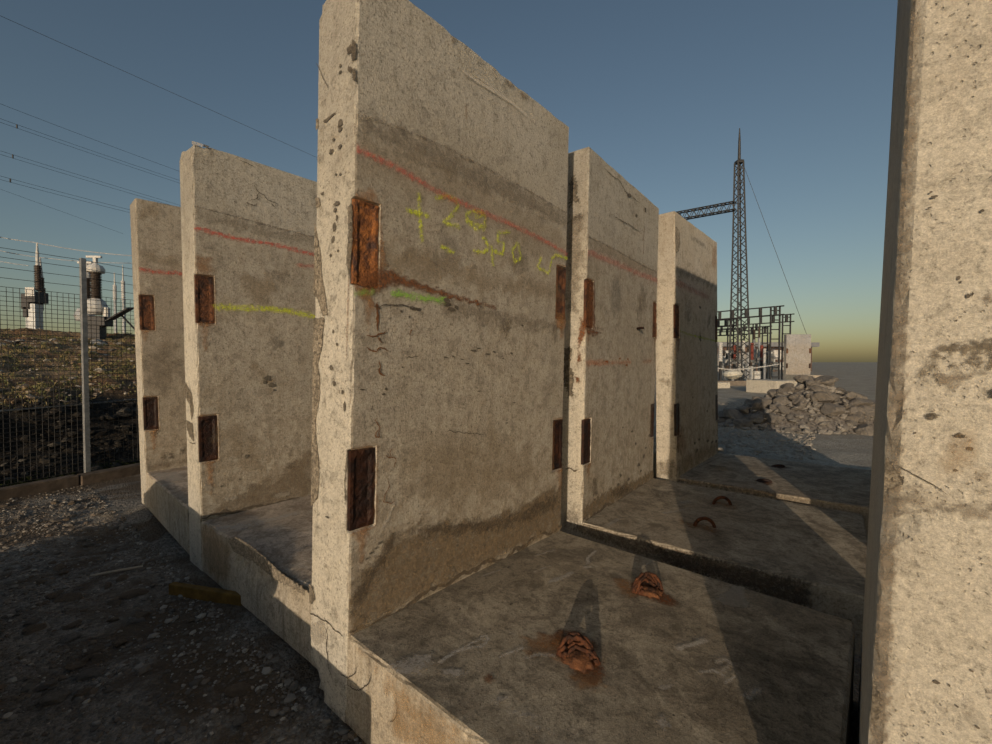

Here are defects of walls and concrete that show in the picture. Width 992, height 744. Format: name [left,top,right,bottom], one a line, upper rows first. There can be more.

corrosion [347,242,494,312]
leakage [349,488,562,635]
crack [310,483,645,677]
leakage [574,462,812,608]